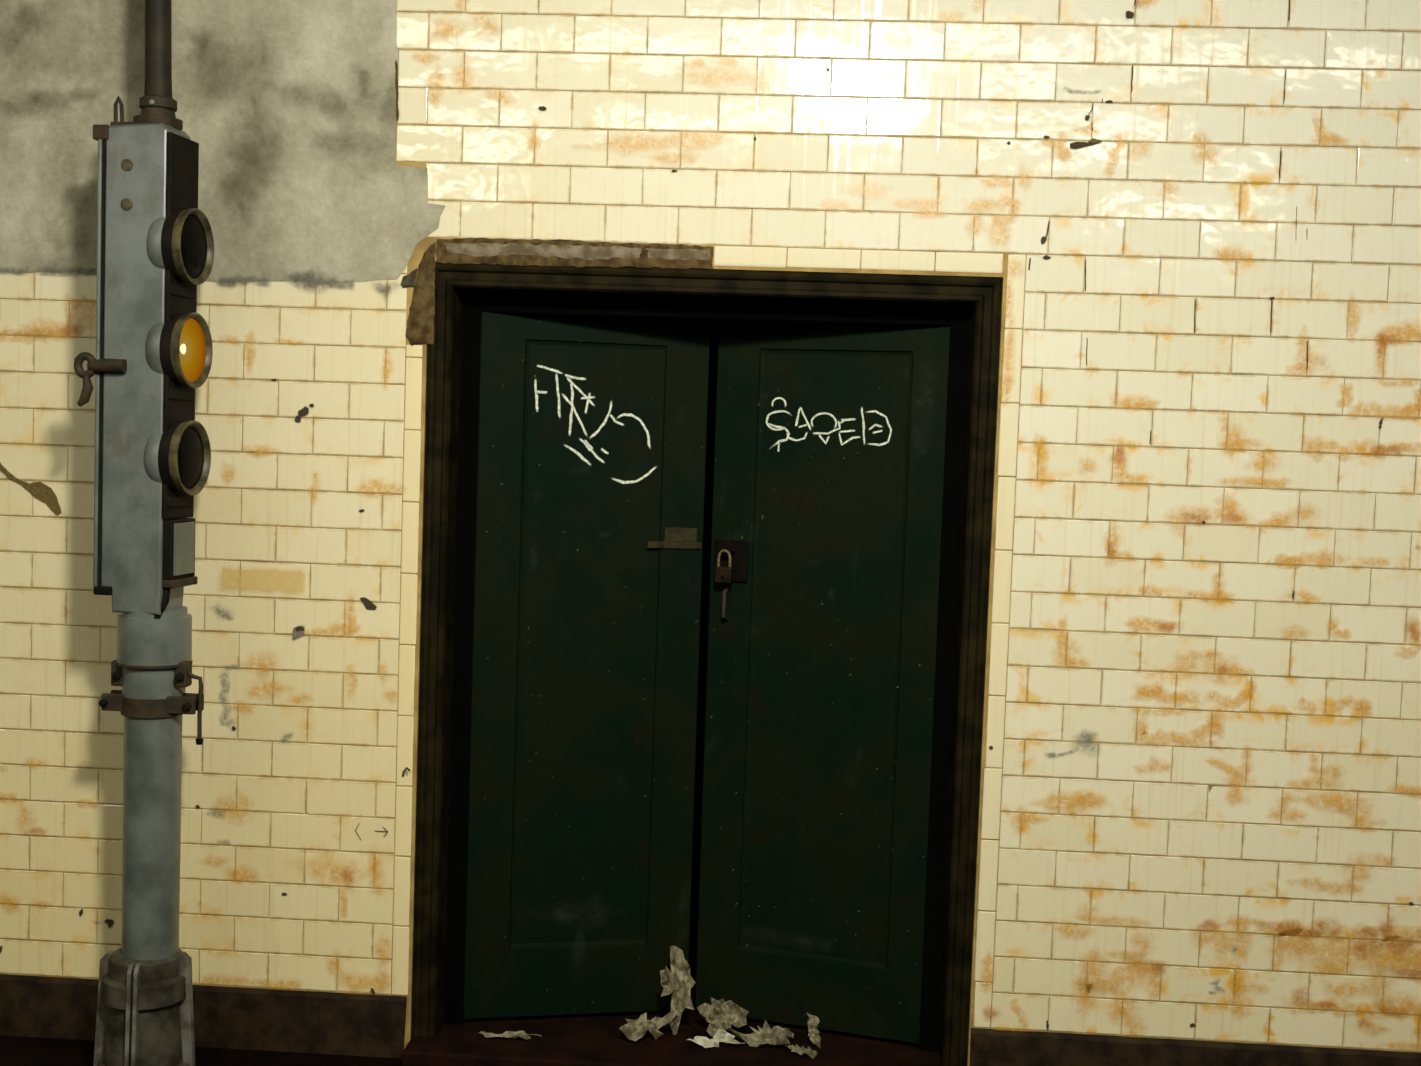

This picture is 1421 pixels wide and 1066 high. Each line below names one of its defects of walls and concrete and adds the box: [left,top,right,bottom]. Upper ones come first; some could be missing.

peeling [400,268,418,288]
rust [1341,446,1411,455]